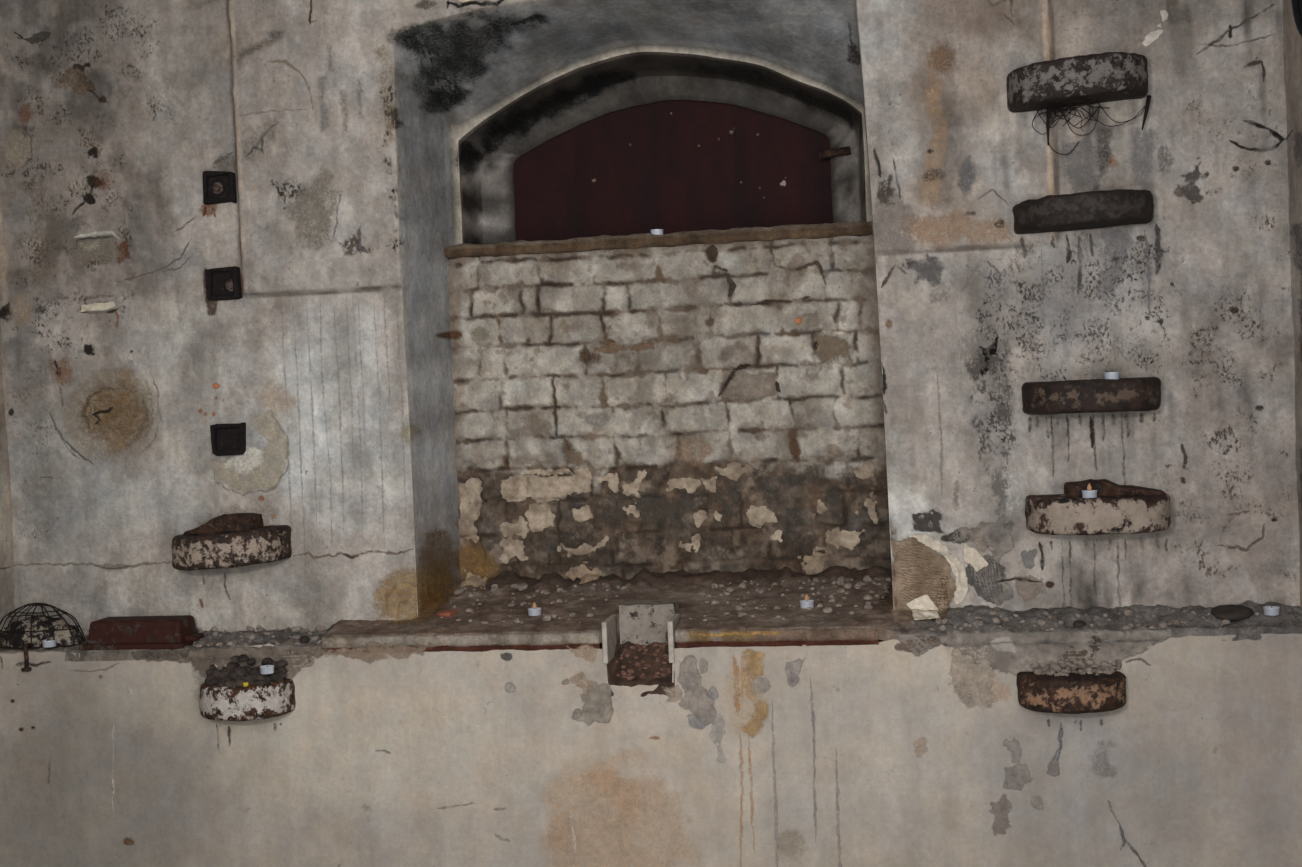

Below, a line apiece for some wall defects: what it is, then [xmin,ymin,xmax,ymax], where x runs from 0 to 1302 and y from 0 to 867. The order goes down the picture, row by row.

leakage [391,13,547,113]
leakage [873,148,1180,526]
leakage [1186,284,1280,397]
leakage [13,367,161,455]
peeling [453,478,484,543]
peeling [499,440,647,564]
peeling [557,535,609,584]
peeling [798,460,878,576]
spalling [889,509,1172,708]
leakage [1205,412,1284,532]
rust [694,631,784,867]
crack [1108,801,1146,867]